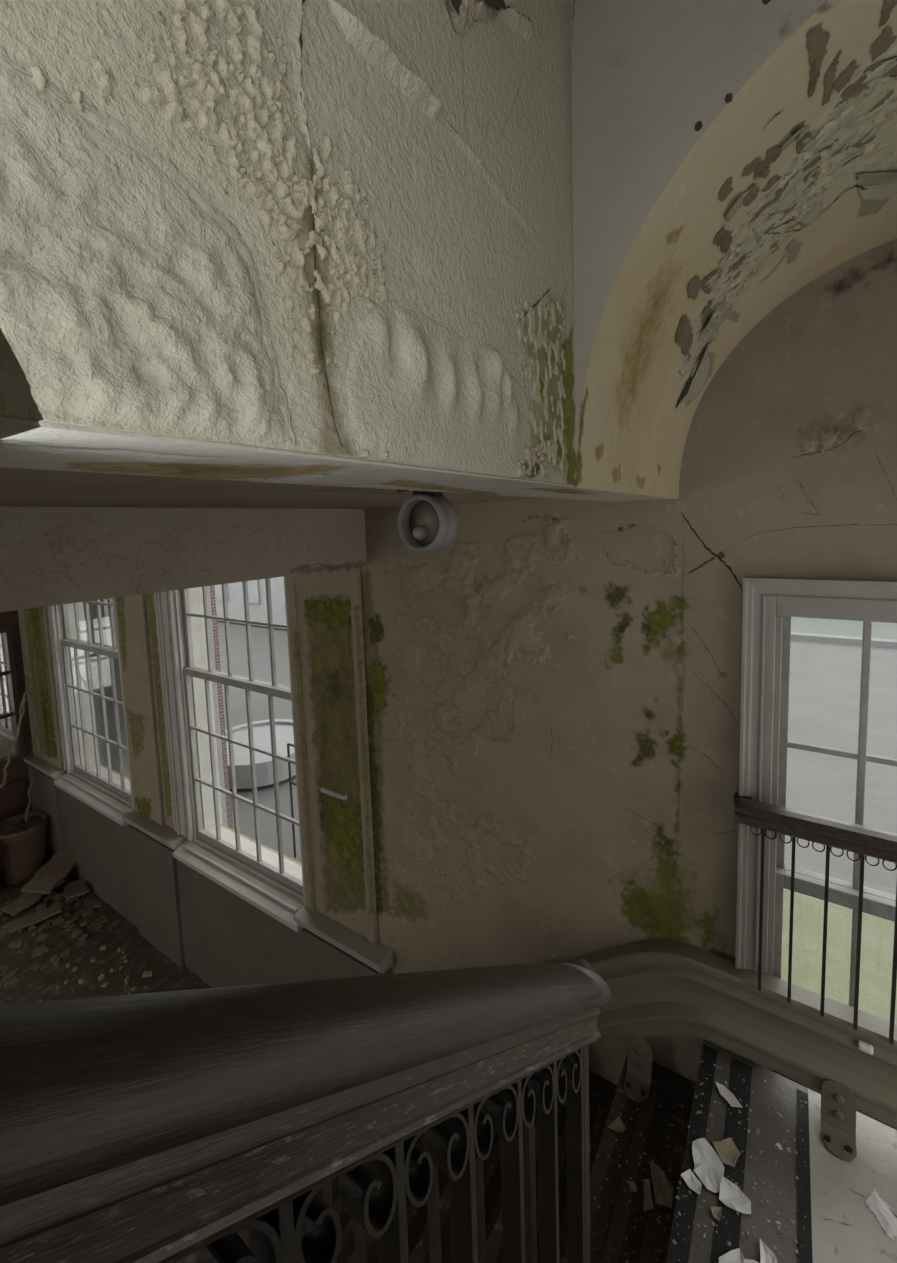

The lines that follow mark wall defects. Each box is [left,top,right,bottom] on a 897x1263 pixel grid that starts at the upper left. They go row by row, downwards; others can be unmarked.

flaking render [445,0,536,46]
crack [289,0,538,454]
peeling [675,0,897,409]
water stain [0,444,340,483]
crack [681,511,881,591]